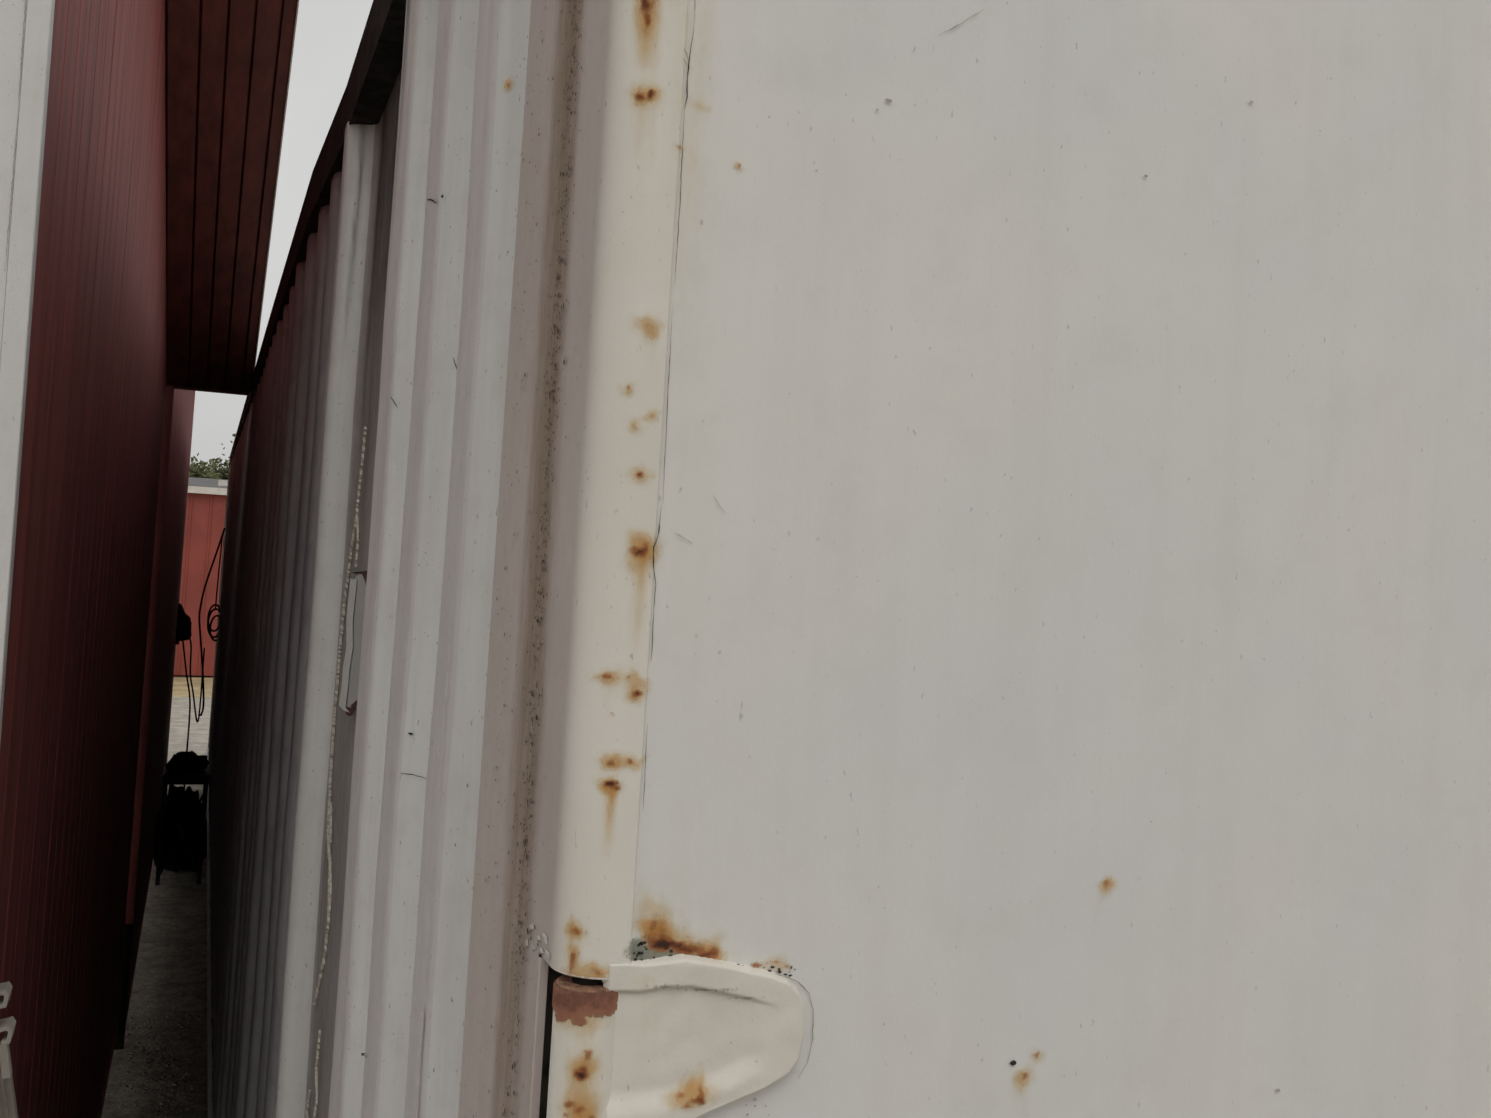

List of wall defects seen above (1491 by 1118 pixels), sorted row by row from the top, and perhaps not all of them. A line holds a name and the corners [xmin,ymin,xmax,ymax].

rust [637,0,656,45]
rust [634,88,658,104]
rust [643,320,657,337]
rust [631,534,656,575]
rust [602,672,644,701]
rust [600,755,637,806]
rust [639,917,721,960]
rust [552,922,618,1026]
rust [564,1051,596,1118]
rust [675,1078,707,1107]